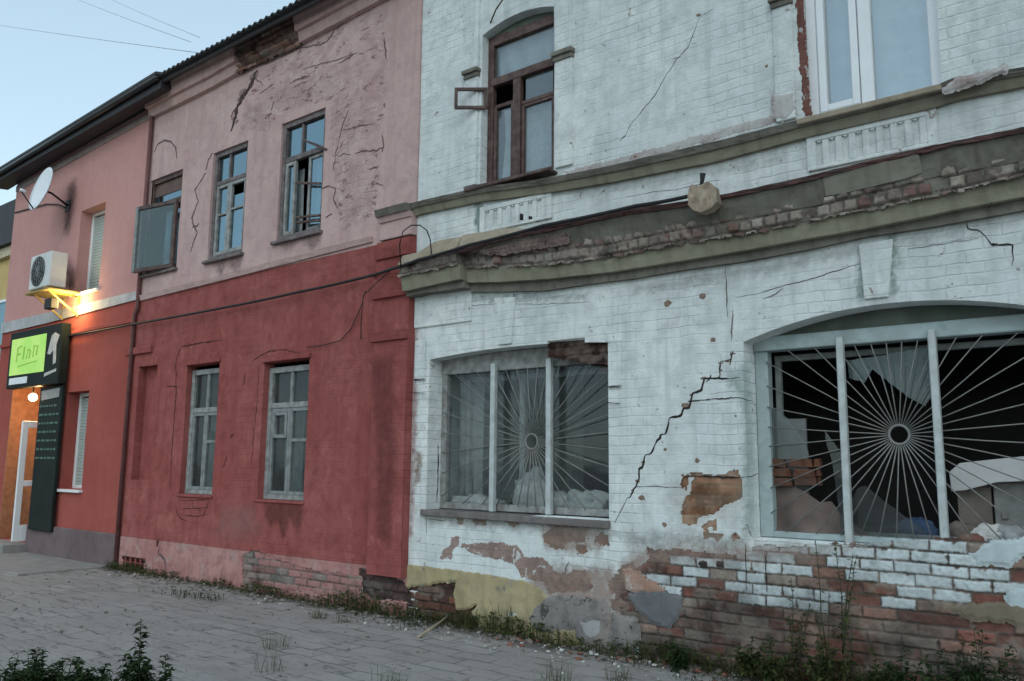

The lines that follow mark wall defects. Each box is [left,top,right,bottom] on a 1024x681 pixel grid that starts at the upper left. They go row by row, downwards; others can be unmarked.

crack [231,7,375,131]
crack [621,11,710,140]
peeling [564,0,813,174]
peeling [942,63,1009,95]
crack [190,153,212,252]
crack [322,112,384,218]
spalling [464,159,1024,269]
crack [910,222,1014,264]
crack [614,264,857,524]
spalling [242,549,477,628]
peeling [440,518,610,593]
spalling [610,458,1024,681]